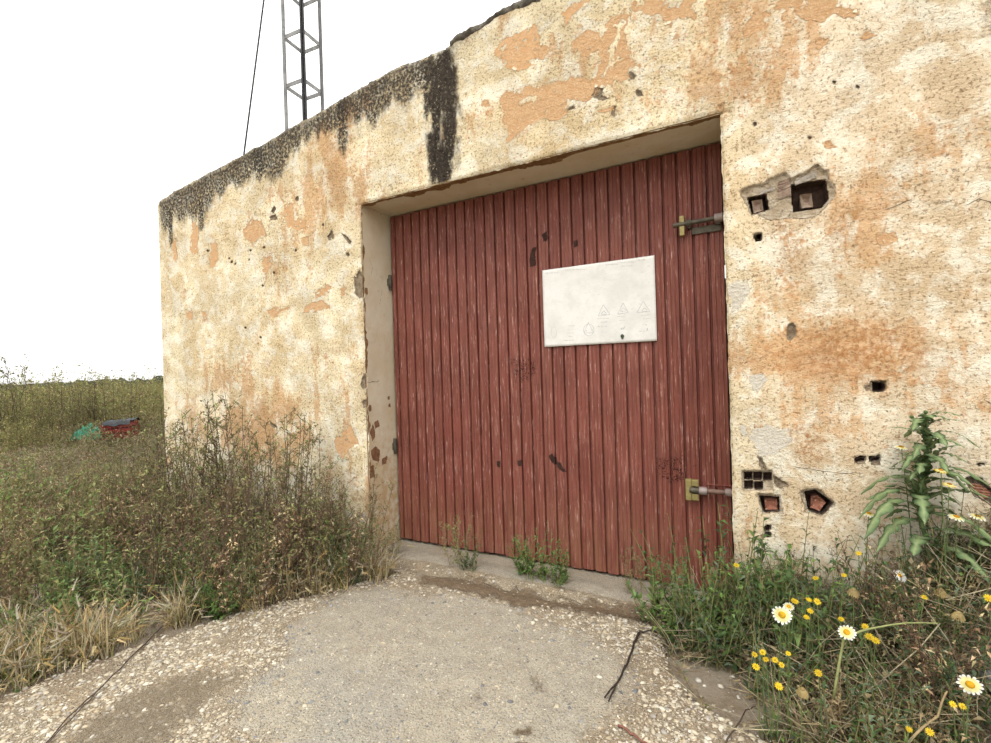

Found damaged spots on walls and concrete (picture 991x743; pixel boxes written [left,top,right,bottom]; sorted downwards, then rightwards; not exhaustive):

peeling [481,0,697,143]
damp [160,47,461,247]
spalling [740,164,836,220]
peeling [189,220,236,268]
peeling [242,196,309,287]
peeling [266,306,291,318]
spalling [304,113,720,513]
spalling [741,455,836,537]
flaking render [965,463,991,505]